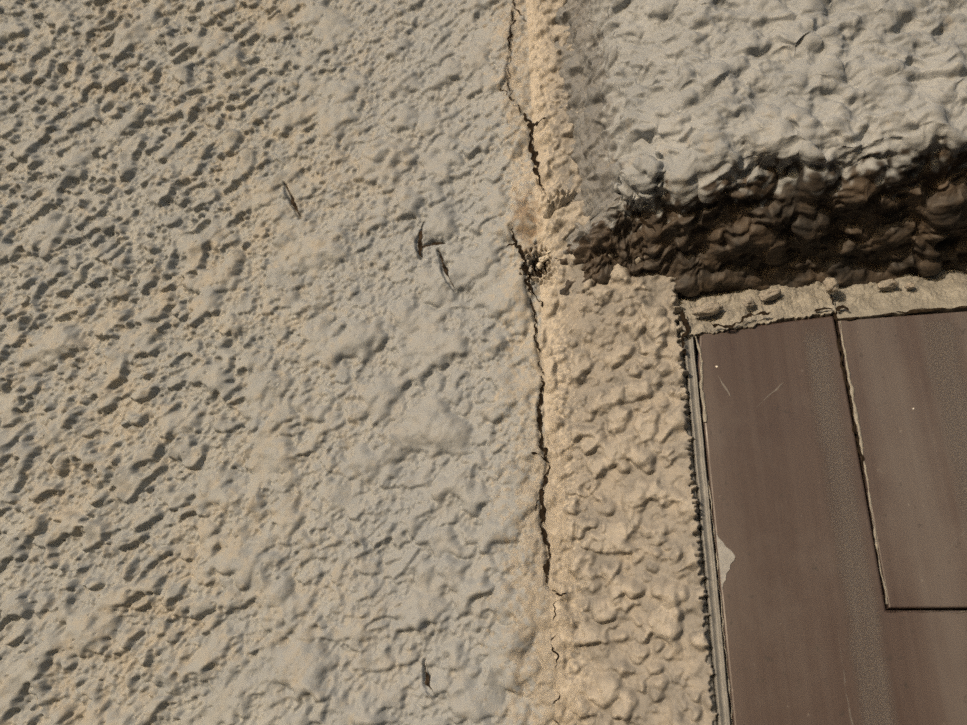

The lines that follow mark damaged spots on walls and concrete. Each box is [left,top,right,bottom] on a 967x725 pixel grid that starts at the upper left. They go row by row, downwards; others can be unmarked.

crack [499,0,546,196]
crack [506,227,566,725]